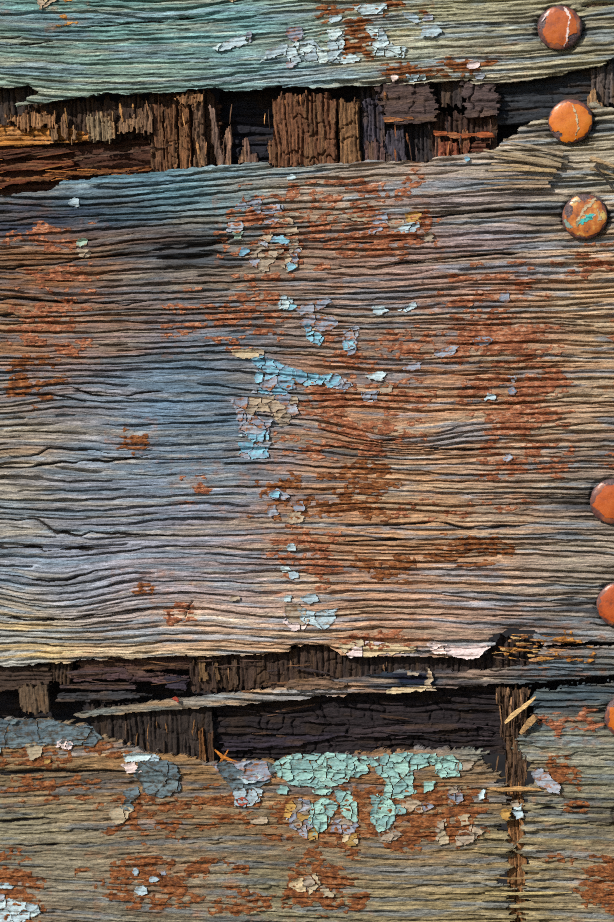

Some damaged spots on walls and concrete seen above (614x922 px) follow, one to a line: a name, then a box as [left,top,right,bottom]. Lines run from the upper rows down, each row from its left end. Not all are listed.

rust [315,0,499,78]
peeling [402,362,422,371]
peeling [231,348,393,459]
peeling [0,718,102,764]
peeling [109,752,181,824]
peeling [212,752,474,846]
peeling [435,814,484,846]
peeling [289,873,334,898]